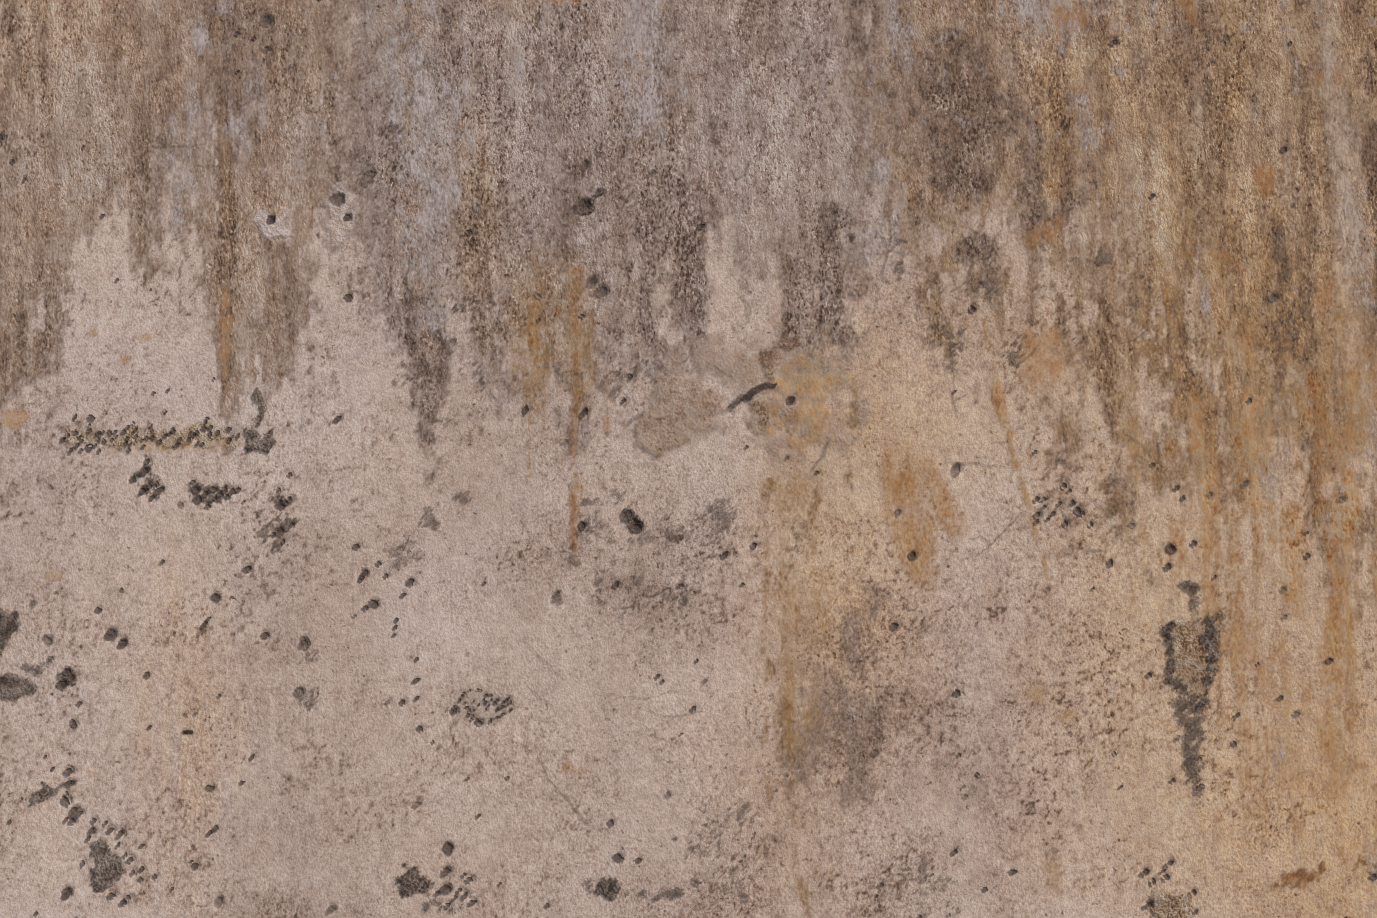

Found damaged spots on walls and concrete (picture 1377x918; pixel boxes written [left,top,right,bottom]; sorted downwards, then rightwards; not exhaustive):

water stain [0,0,1377,586]
rust [882,459,960,580]
rust [992,380,1019,468]
rust [1167,325,1377,794]